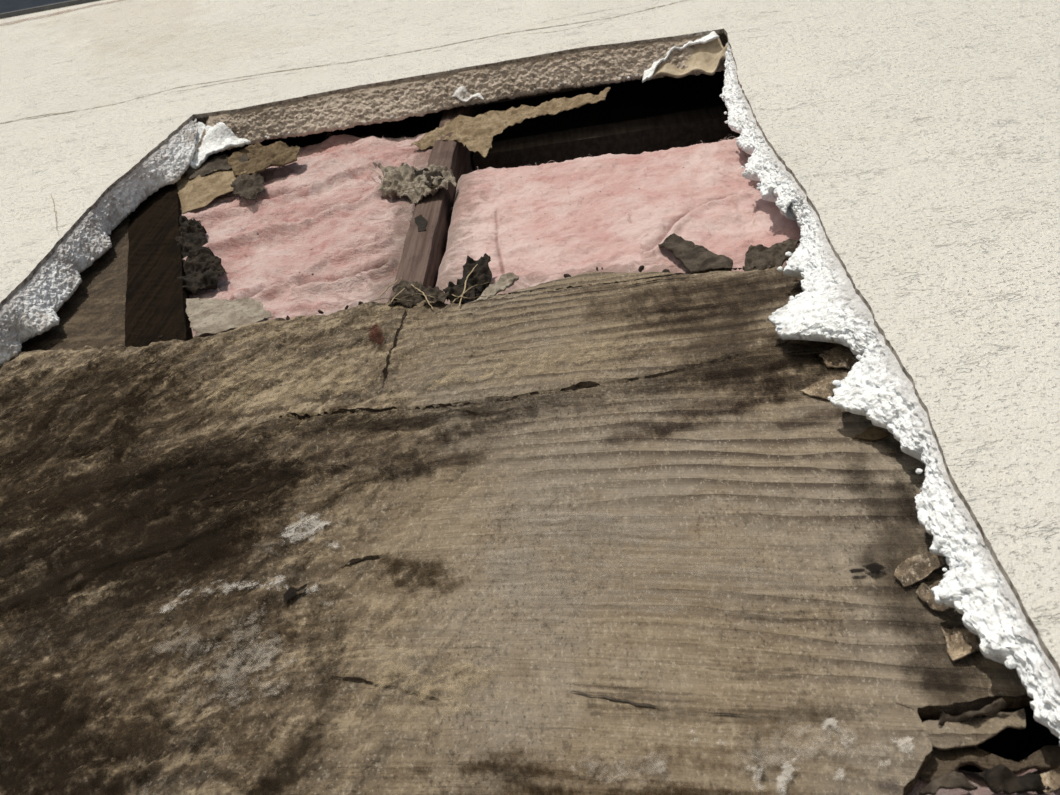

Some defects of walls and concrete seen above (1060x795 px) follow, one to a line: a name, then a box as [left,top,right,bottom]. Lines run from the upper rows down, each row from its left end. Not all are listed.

peeling [451,86,484,103]
spalling [0,119,251,365]
crack [258,304,745,425]
spalling [618,31,1060,744]